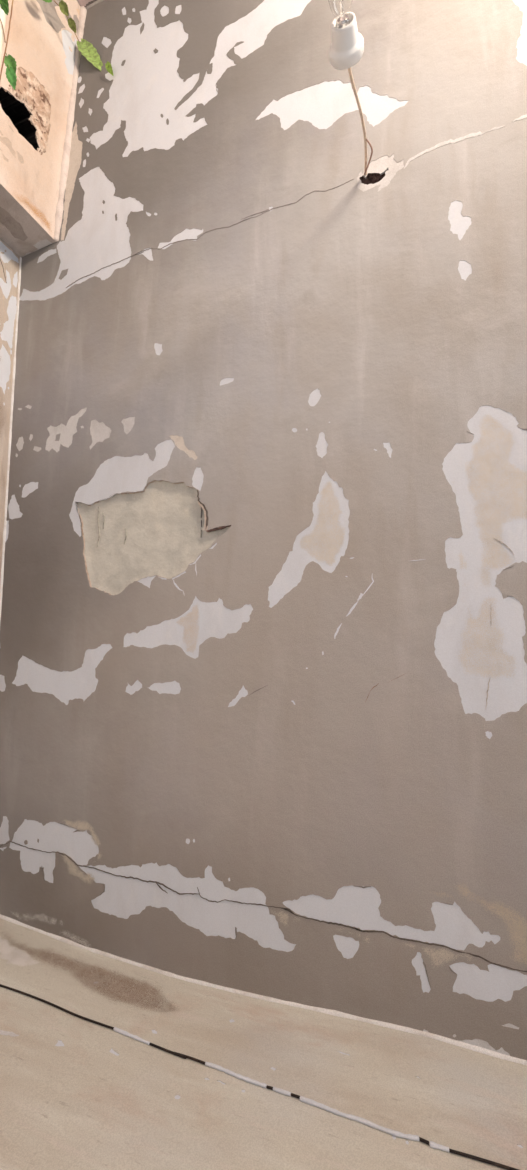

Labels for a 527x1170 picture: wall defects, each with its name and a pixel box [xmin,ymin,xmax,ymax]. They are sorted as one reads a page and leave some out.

peeling [0,0,311,405]
peeling [256,80,409,130]
spalling [357,154,404,192]
crack [403,114,527,169]
peeling [16,408,135,457]
spalling [69,435,231,595]
peeling [268,422,354,608]
peeling [434,405,527,739]
peeling [0,596,253,707]
peeling [0,816,296,952]
crack [0,841,527,972]
peeling [283,885,527,1002]